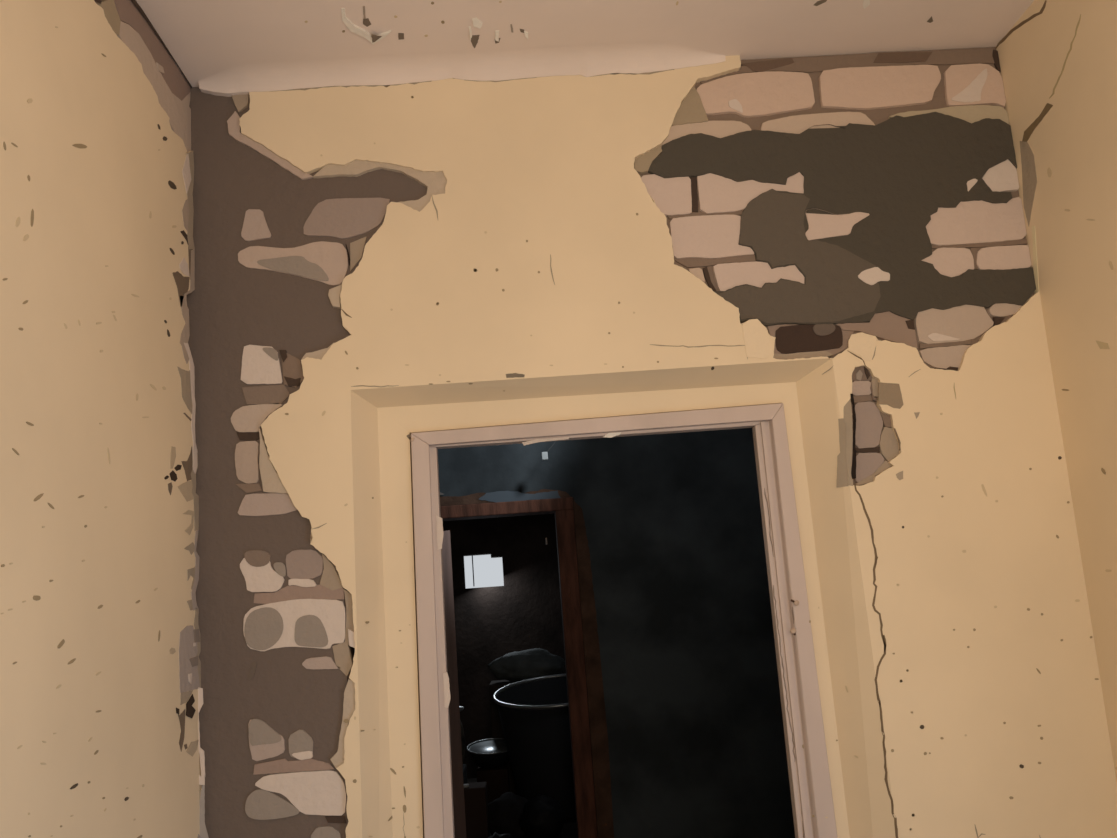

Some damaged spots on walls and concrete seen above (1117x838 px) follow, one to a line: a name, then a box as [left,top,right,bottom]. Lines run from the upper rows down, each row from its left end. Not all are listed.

spalling [94,0,447,838]
spalling [634,47,1037,371]
crack [823,348,876,374]
spalling [837,367,920,487]
peeling [443,672,451,708]
crack [850,394,898,838]